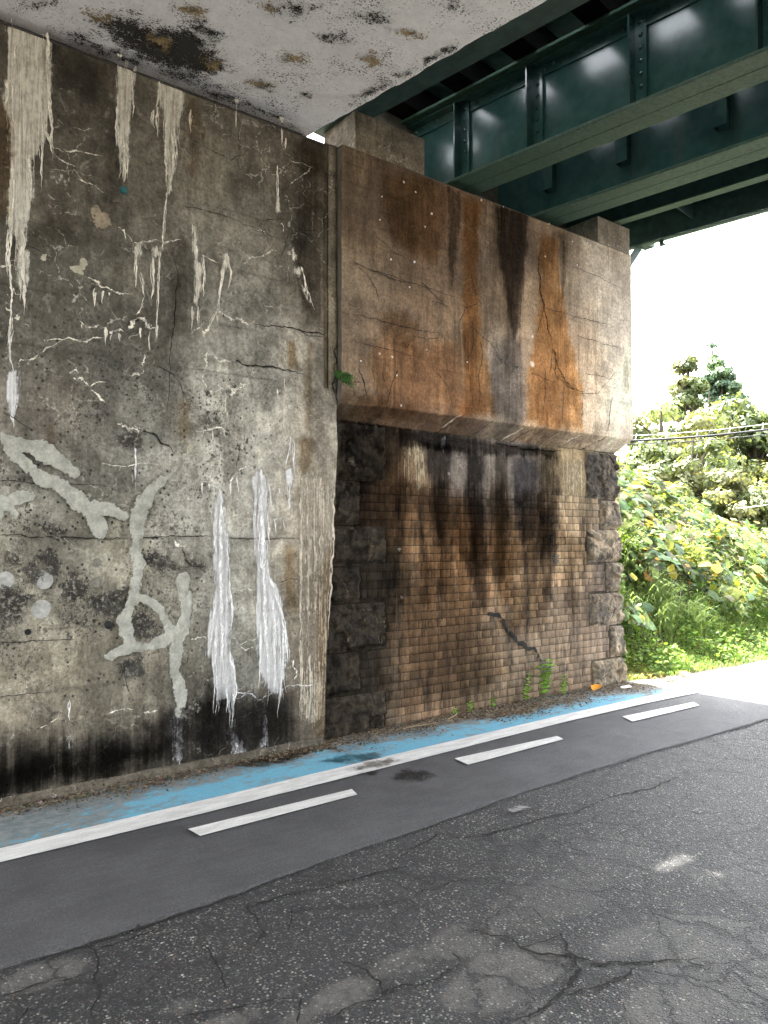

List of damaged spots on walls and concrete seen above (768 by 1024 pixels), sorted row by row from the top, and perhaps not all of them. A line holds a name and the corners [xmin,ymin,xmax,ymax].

efflorescence [115,53,137,182]
efflorescence [2,18,54,425]
efflorescence [133,76,193,332]
crack [185,206,317,264]
damp [495,205,528,338]
crack [0,227,618,496]
damp [0,420,583,798]
crack [487,612,542,663]
crack [469,907,722,1021]